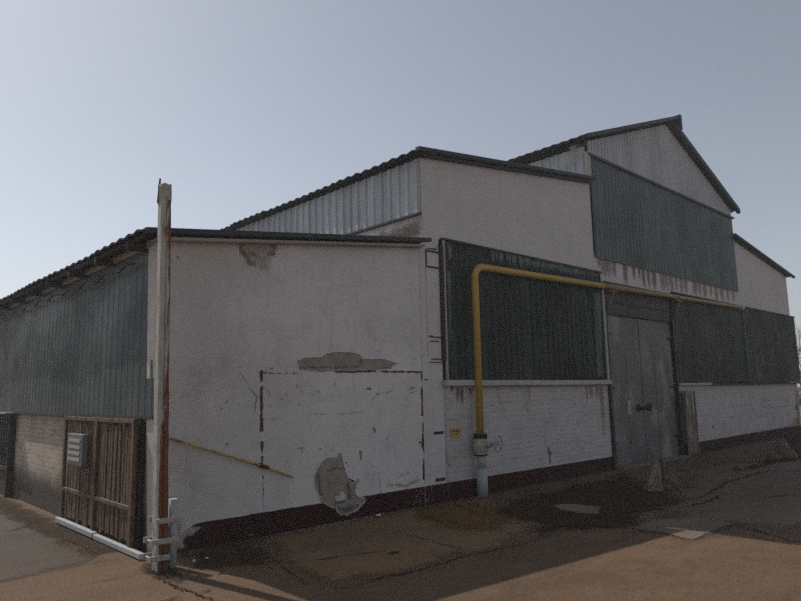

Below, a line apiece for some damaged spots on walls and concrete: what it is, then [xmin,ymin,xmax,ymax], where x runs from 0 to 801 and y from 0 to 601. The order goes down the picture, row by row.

flaking render [297,351,398,372]
flaking render [313,448,366,516]